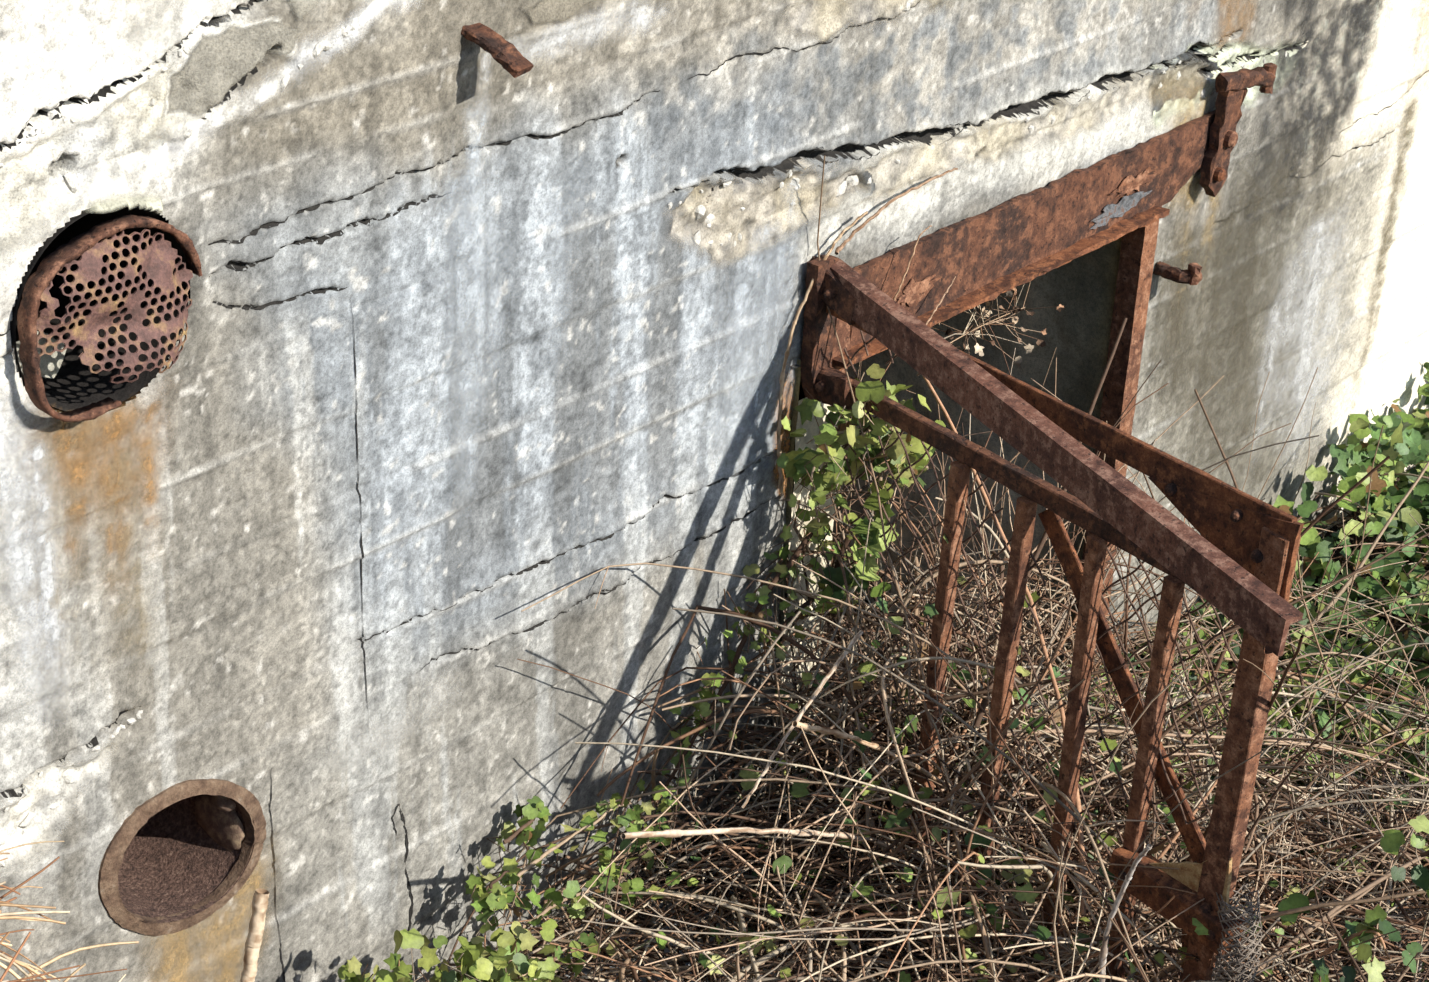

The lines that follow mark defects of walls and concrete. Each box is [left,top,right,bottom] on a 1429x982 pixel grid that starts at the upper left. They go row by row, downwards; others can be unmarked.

crack [0,0,268,168]
spalling [670,42,1300,264]
crack [668,33,1309,210]
crack [208,2,919,726]
crack [1,706,143,812]